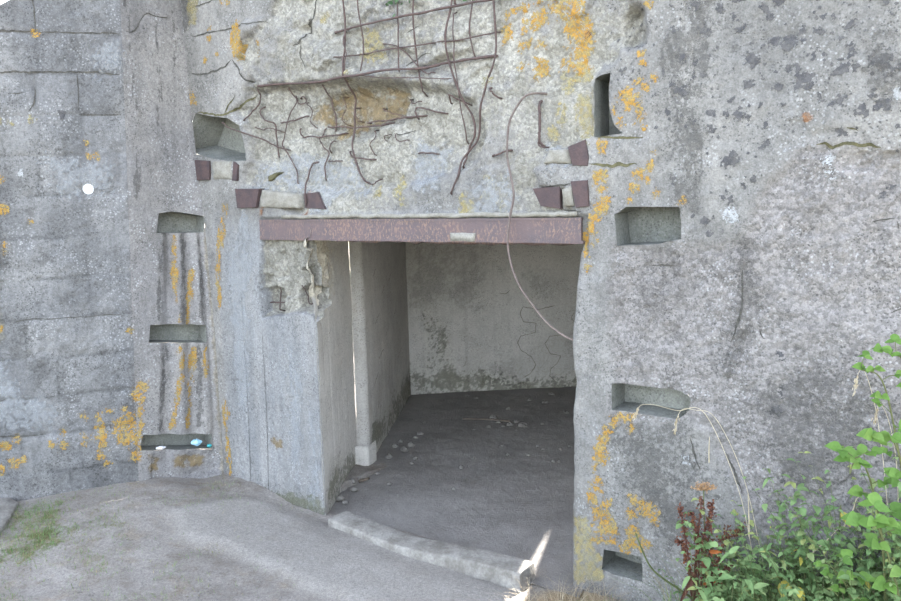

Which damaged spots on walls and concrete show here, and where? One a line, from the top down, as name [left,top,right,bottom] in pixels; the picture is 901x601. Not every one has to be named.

spalling [222,0,657,218]
spalling [258,240,332,321]
crack [501,290,574,381]